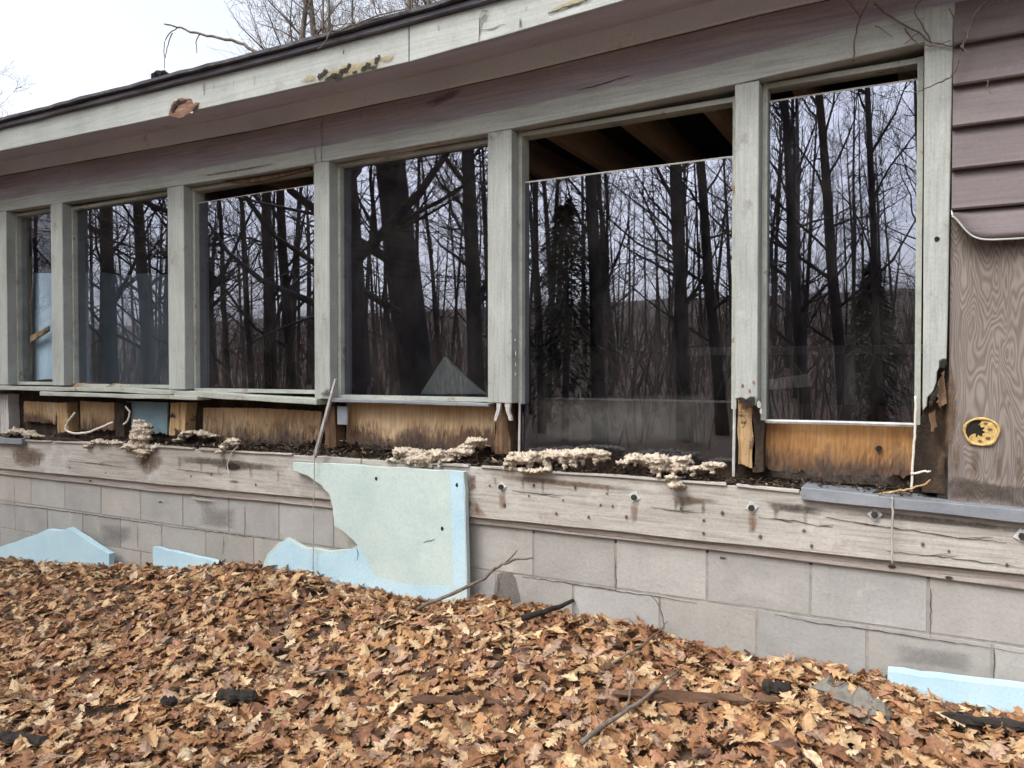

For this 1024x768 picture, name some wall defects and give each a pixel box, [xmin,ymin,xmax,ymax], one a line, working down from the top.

spalling [317,55,380,82]
peeling [168,98,199,118]
crack [758,517,1018,568]